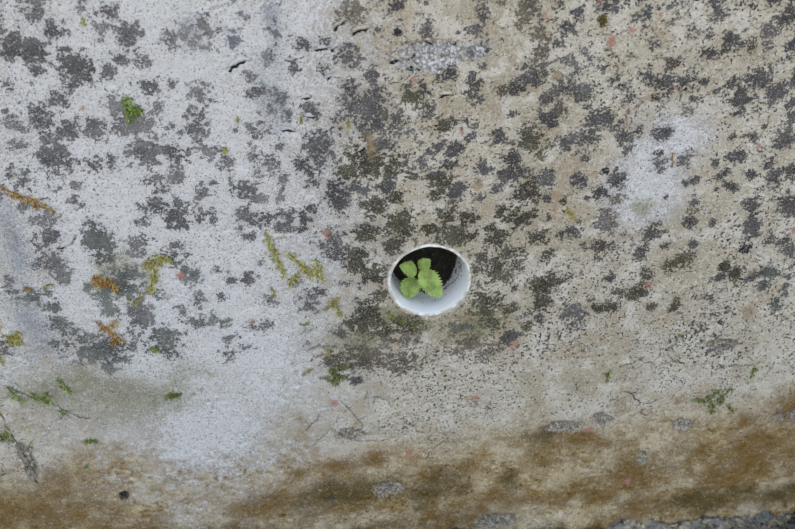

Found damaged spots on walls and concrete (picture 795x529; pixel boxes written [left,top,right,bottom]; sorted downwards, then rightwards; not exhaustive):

spalling [383,34,489,85]
leakage [0,0,515,529]
leakage [535,427,608,466]
leakage [553,417,795,529]